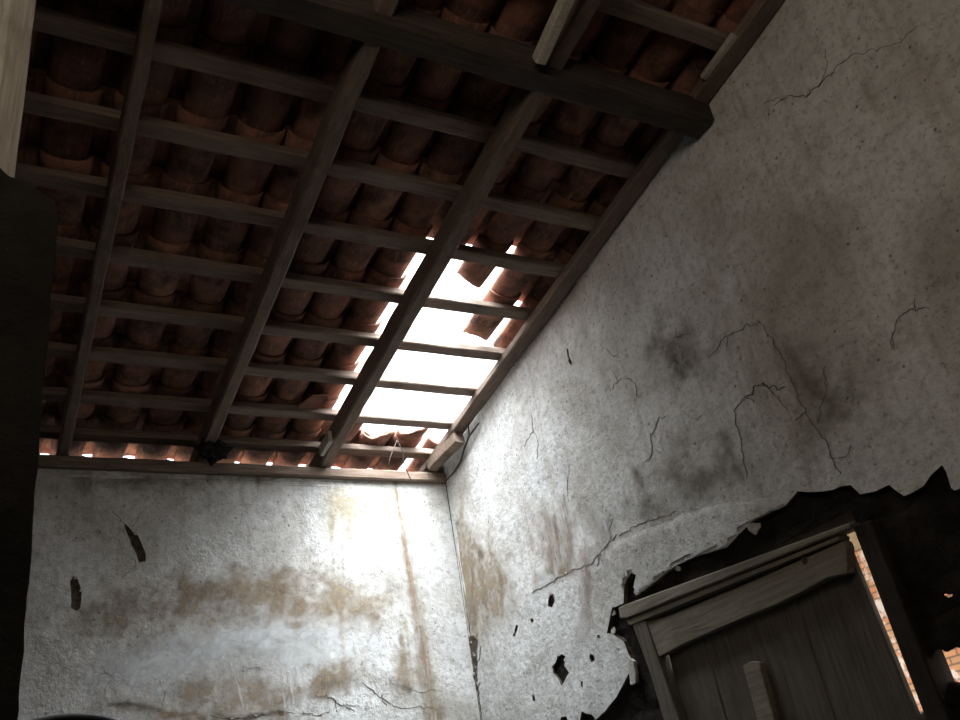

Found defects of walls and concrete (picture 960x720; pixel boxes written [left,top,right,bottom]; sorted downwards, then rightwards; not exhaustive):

crack [708,321,851,474]
spalling [122,521,145,562]
leakage [152,566,312,640]
leakage [456,521,507,637]
crack [532,511,679,593]
flaking render [584,468,960,720]
leakage [183,662,352,718]
leakage [398,636,412,691]
leakage [416,625,442,720]
spalling [554,653,569,684]